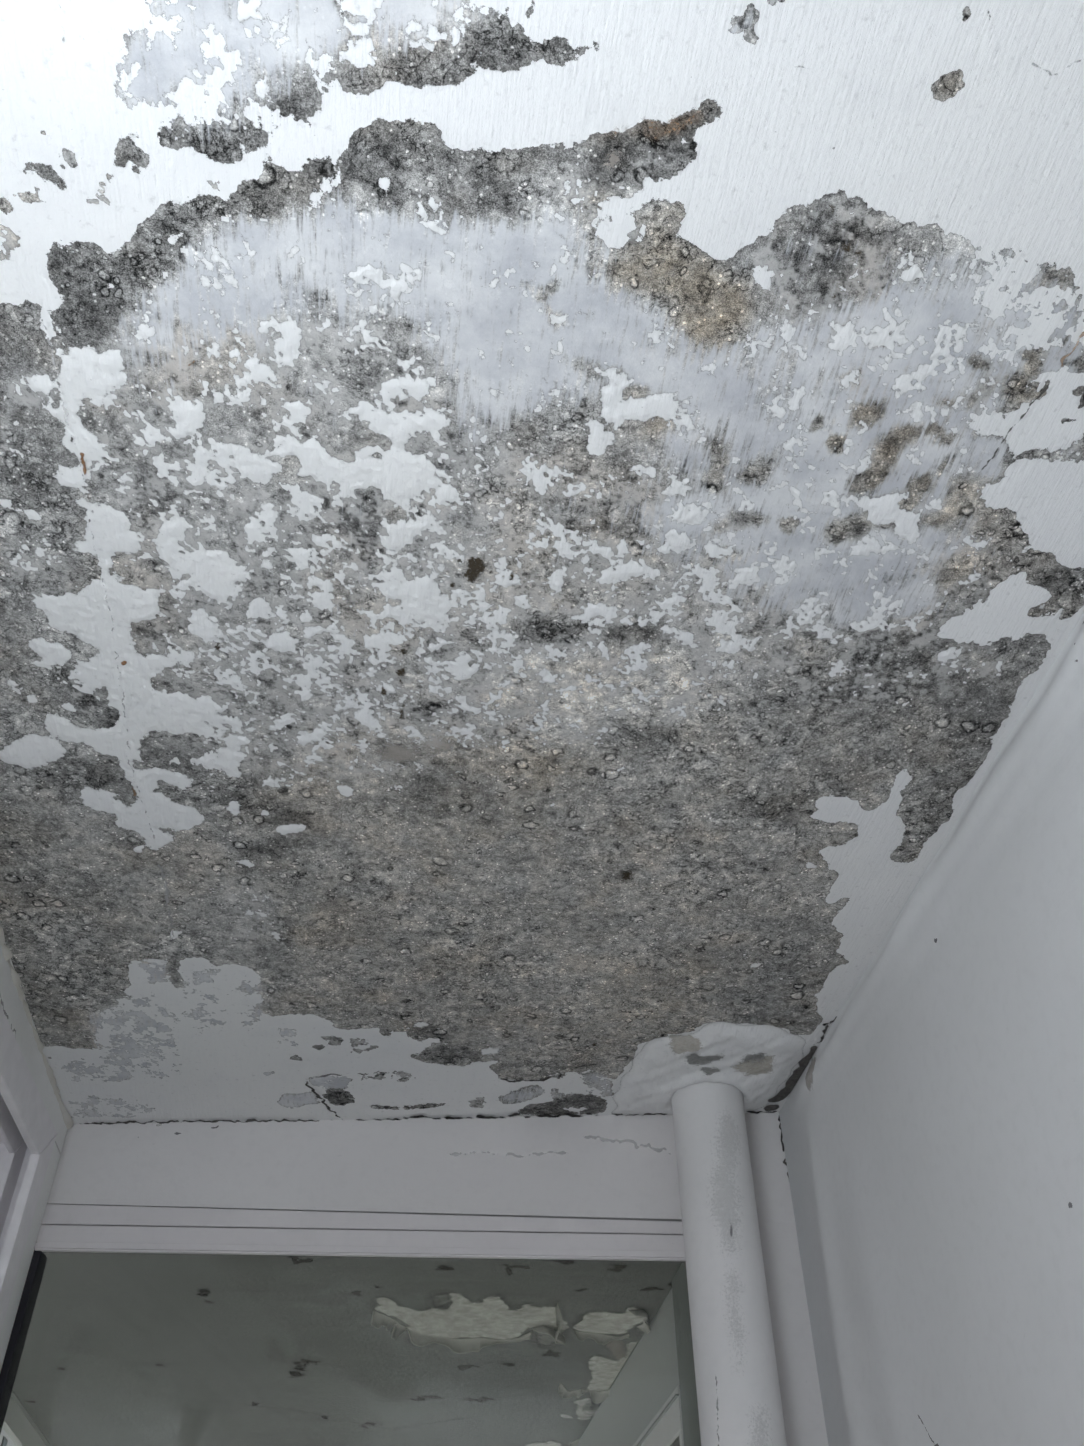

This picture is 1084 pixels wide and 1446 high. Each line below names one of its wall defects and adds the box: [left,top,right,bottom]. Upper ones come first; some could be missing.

peeling [0,0,1084,1120]
peeling [352,1287,650,1423]